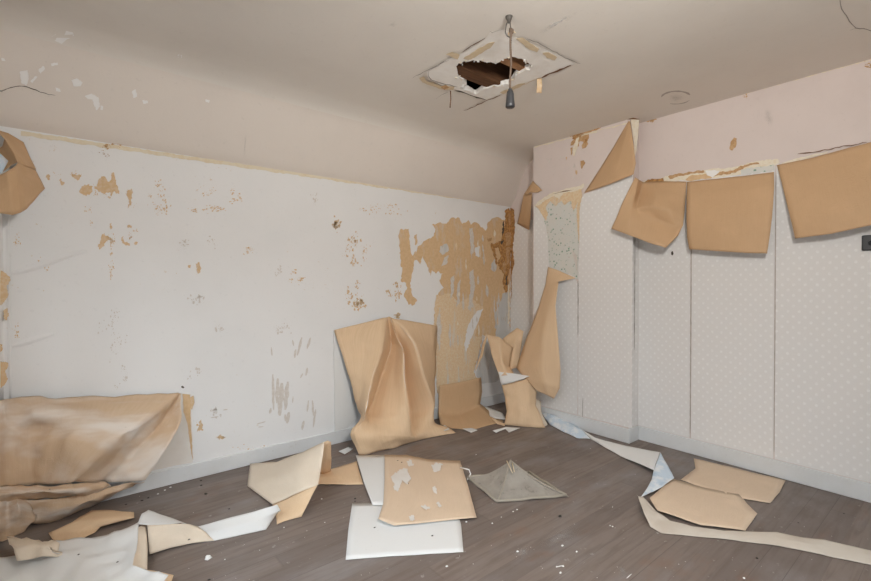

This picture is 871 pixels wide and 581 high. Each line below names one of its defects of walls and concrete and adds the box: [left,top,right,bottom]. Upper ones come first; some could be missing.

spalling [413,29,580,110]
peeling [566,127,601,175]
peeling [46,172,134,224]
peeling [98,223,138,280]
peeling [386,217,511,399]
peeling [516,267,575,399]